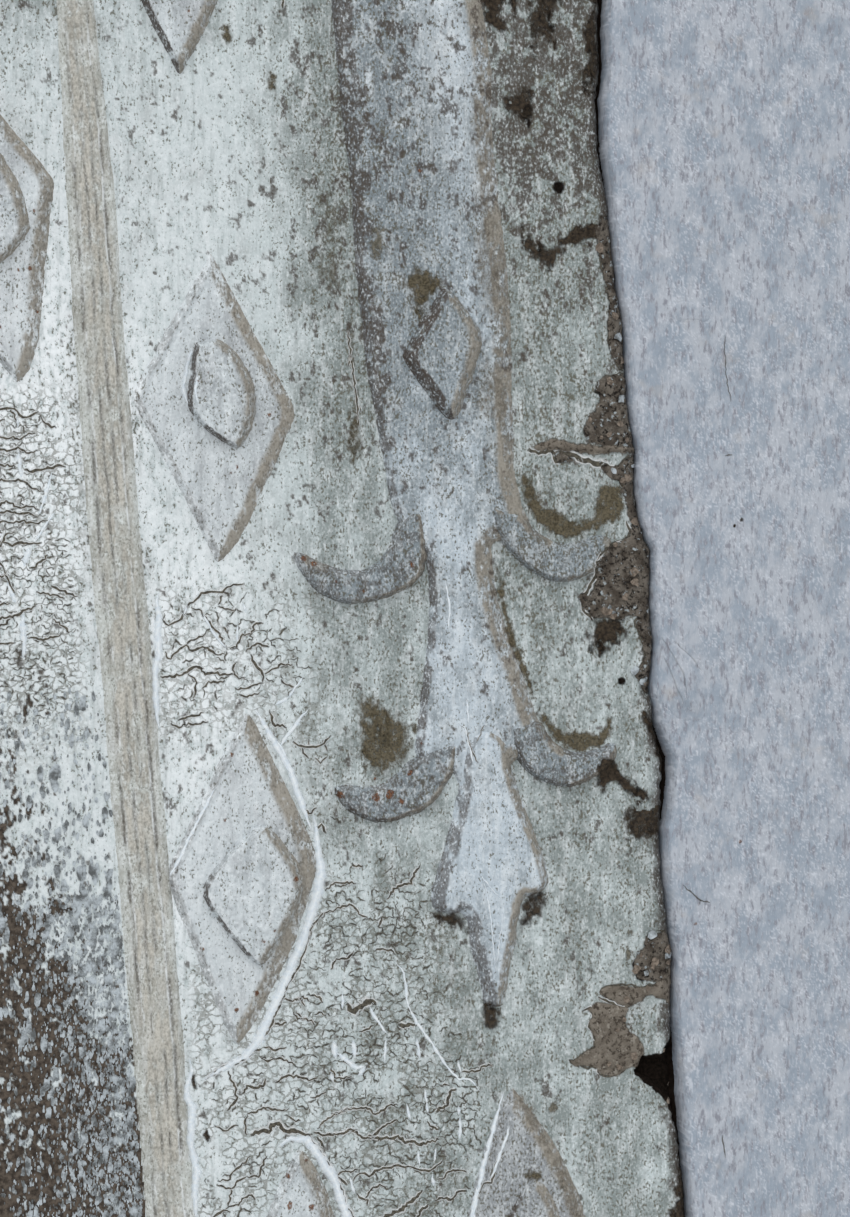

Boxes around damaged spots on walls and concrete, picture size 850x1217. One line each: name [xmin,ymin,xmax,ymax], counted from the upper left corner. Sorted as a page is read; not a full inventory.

damp [482,0,516,32]
damp [583,31,599,85]
damp [520,215,602,272]
spalling [534,217,652,693]
crack [0,401,78,716]
crack [160,583,331,765]
crack [305,807,340,833]
crack [202,854,504,1217]
spalling [569,930,677,1130]